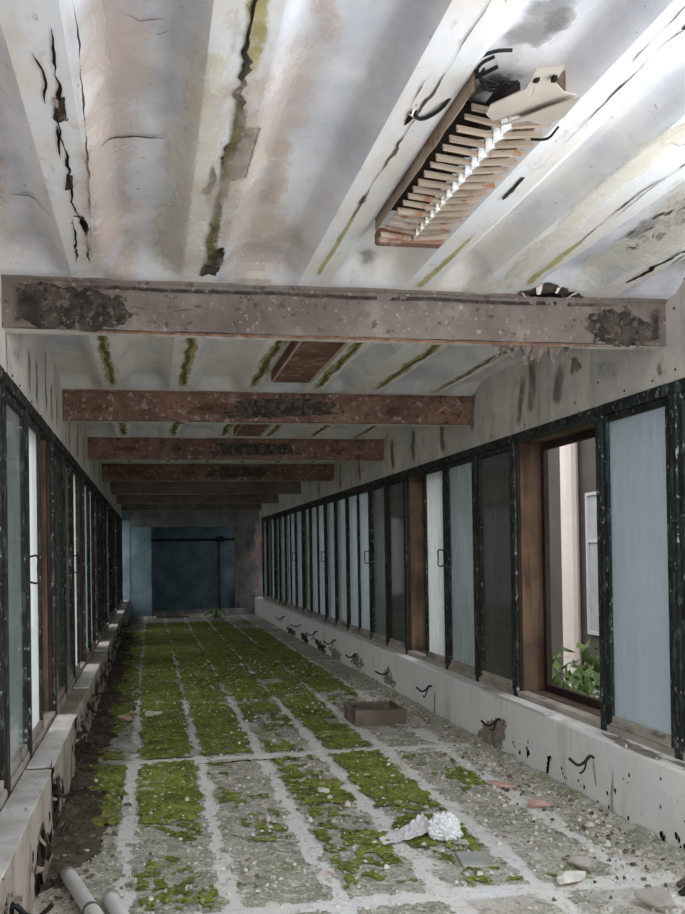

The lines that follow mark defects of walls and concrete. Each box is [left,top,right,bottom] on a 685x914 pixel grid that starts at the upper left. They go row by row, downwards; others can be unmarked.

crack [32,0,164,263]
damp [155,55,228,273]
crack [232,0,258,118]
crack [337,0,491,240]
damp [506,124,685,281]
crack [591,7,685,117]
damp [244,254,268,286]
damp [468,280,492,294]
spalling [518,282,584,299]
crack [627,251,685,283]
peeling [513,345,582,373]
spalling [32,760,64,896]